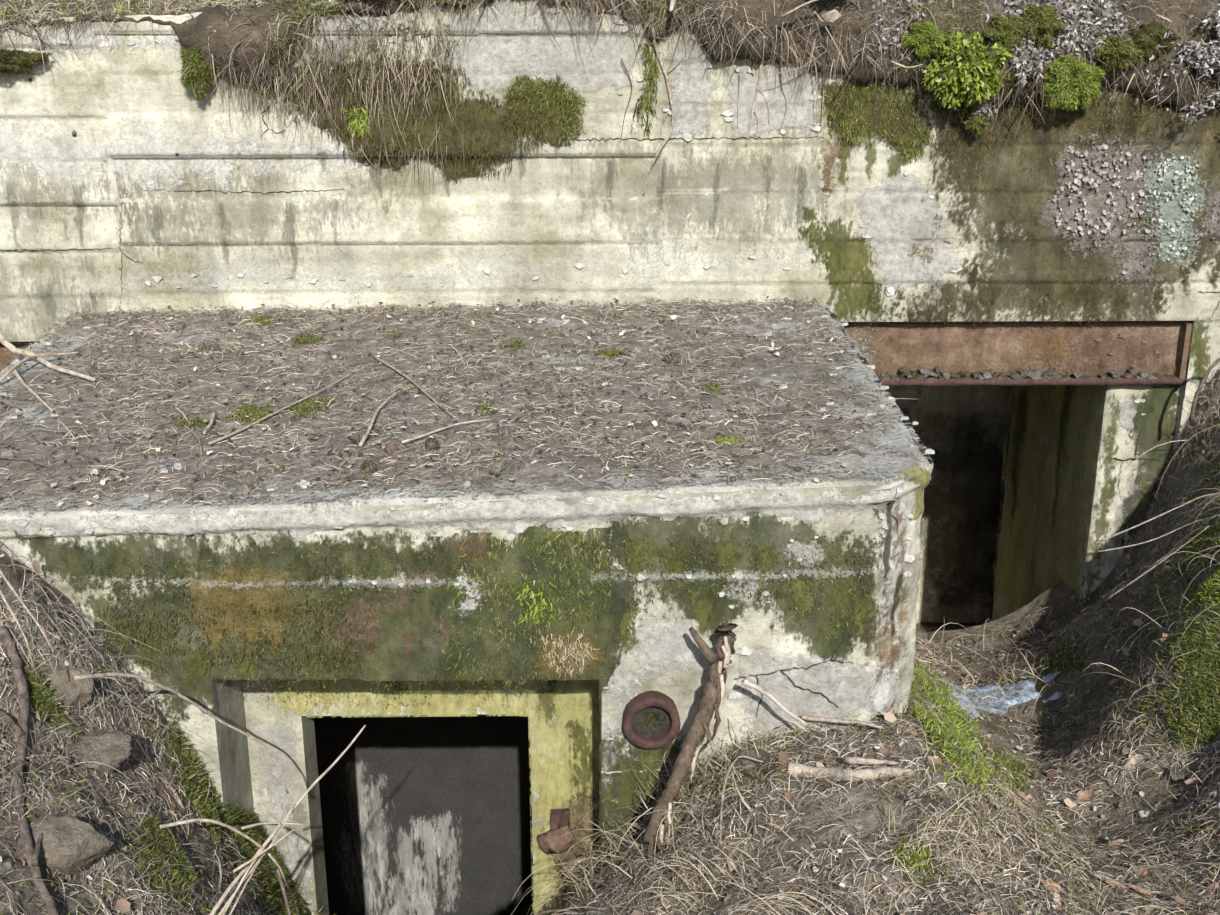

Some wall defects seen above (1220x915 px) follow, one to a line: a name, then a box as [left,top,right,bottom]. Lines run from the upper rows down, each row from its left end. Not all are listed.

damp [0,109,368,196]
damp [802,207,820,248]
damp [824,81,1220,326]
damp [916,388,1027,624]
damp [59,546,133,600]
damp [103,545,291,688]
damp [330,543,433,596]
damp [454,574,491,611]
crack [734,627,859,717]